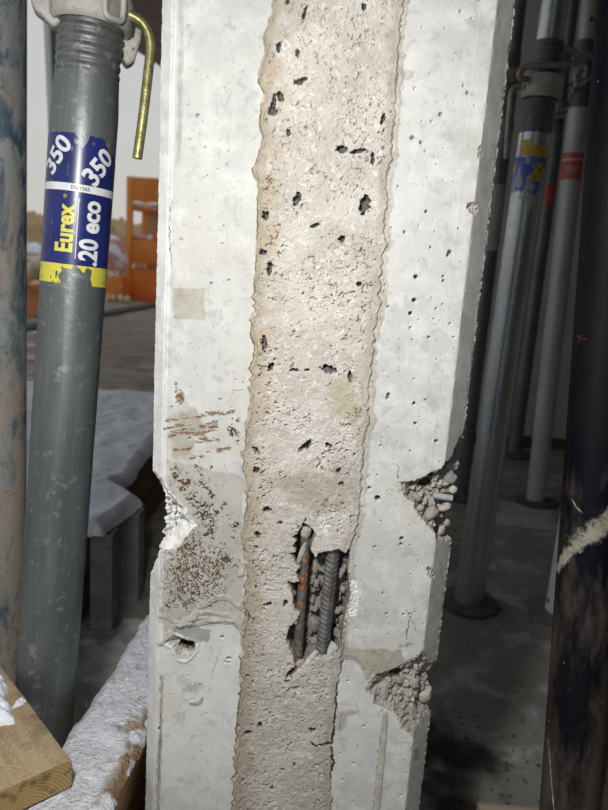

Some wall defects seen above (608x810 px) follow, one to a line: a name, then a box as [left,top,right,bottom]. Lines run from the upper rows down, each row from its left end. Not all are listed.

corrosion [163,383,240,459]
spalling [151,469,198,573]
spalling [399,431,464,542]
spalling [286,518,351,679]
crack [311,682,338,778]
spalling [365,649,437,748]